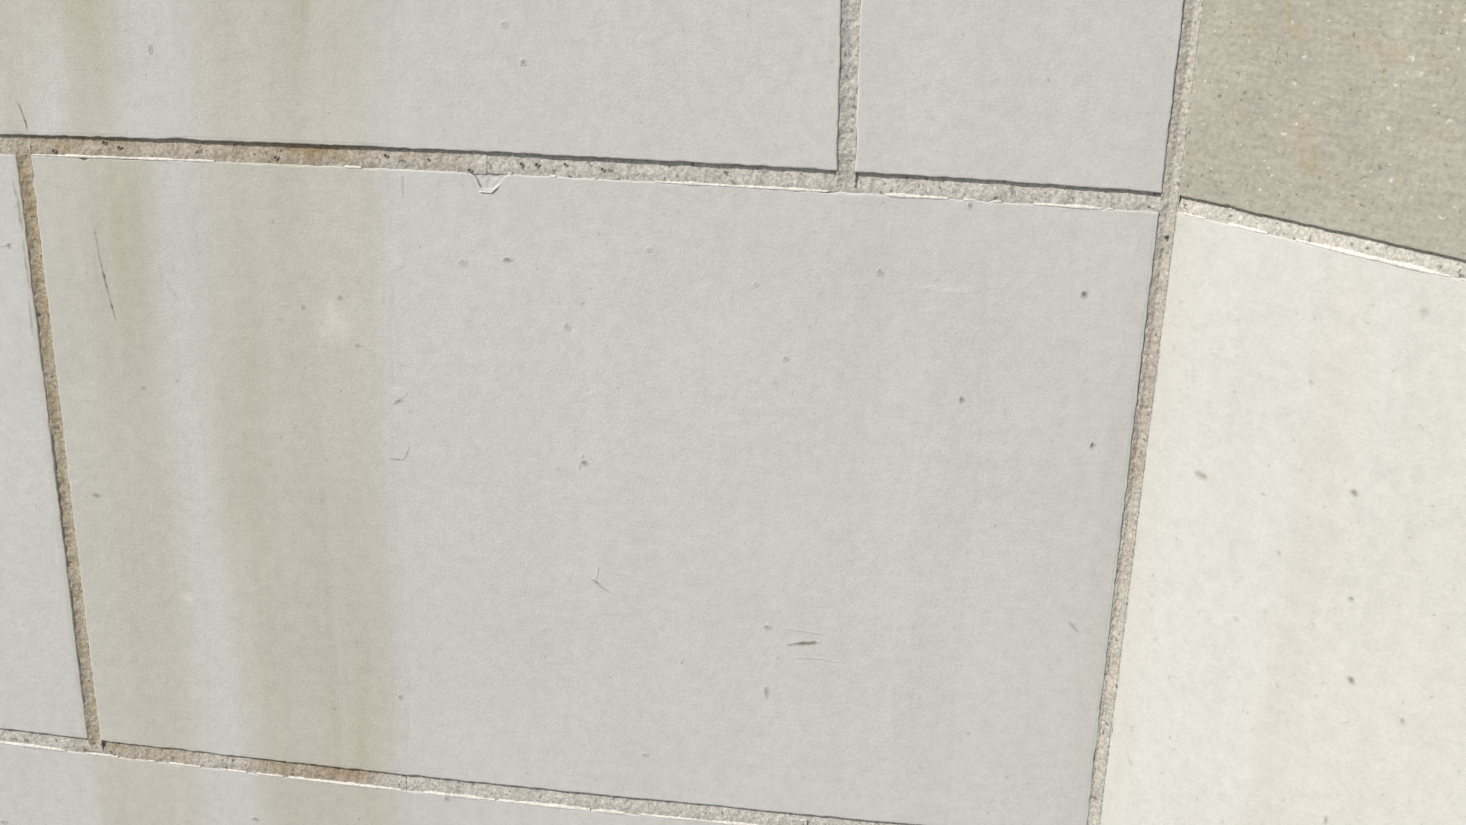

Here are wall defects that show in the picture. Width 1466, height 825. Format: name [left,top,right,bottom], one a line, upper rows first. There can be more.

leakage [0,0,134,134]
leakage [165,0,397,144]
leakage [34,159,411,772]
leakage [87,756,224,825]
leakage [247,776,414,825]